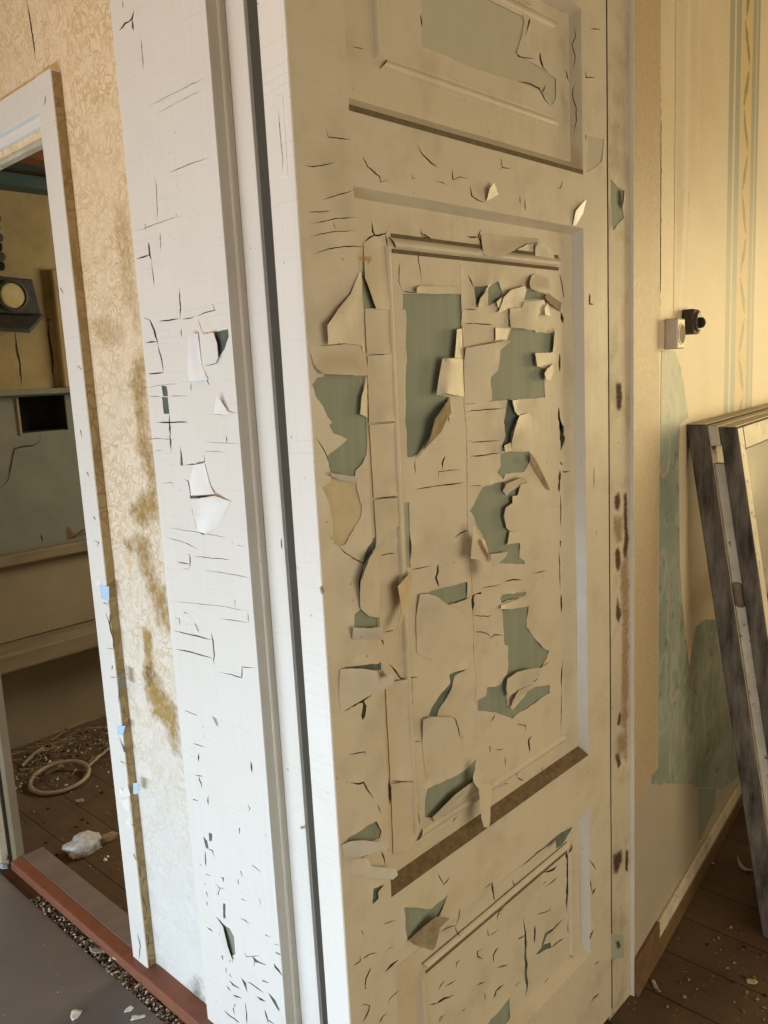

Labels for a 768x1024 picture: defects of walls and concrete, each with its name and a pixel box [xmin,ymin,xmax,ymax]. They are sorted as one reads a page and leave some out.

crack [312,189,388,254]
crack [146,290,215,451]
water stain [132,366,155,522]
peeling [189,463,231,534]
peeling [309,235,562,640]
water stain [127,538,169,623]
water stain [142,630,177,745]
crack [177,602,252,678]
peeling [478,592,549,718]
peeling [338,668,492,880]
crack [200,848,282,1024]
peeling [404,897,450,951]